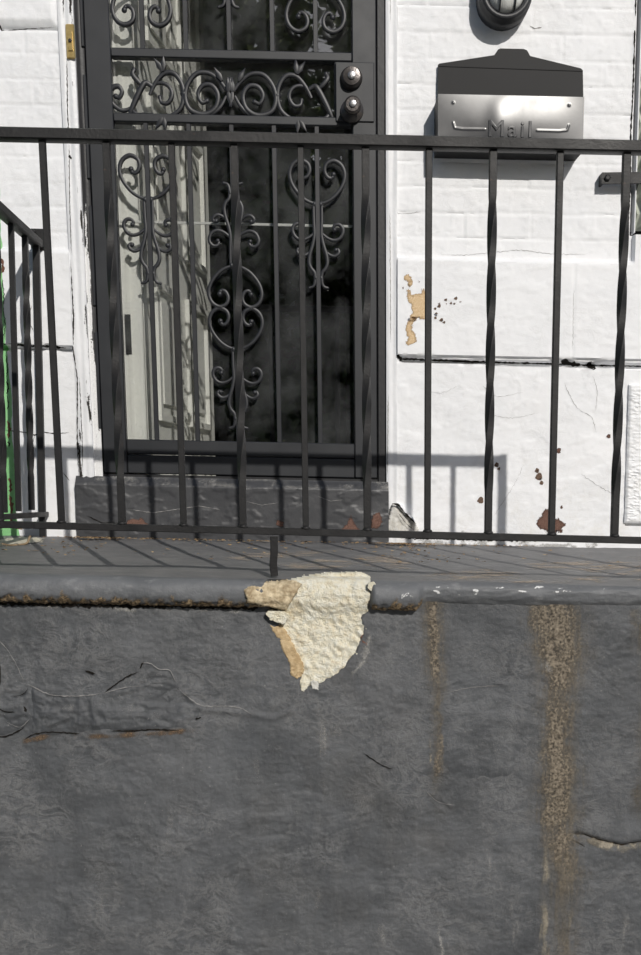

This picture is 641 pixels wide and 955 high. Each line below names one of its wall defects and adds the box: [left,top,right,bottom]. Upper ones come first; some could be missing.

peeling [403,274,457,345]
peeling [449,569,542,595]
spalling [244,551,376,692]
crack [570,833,641,849]